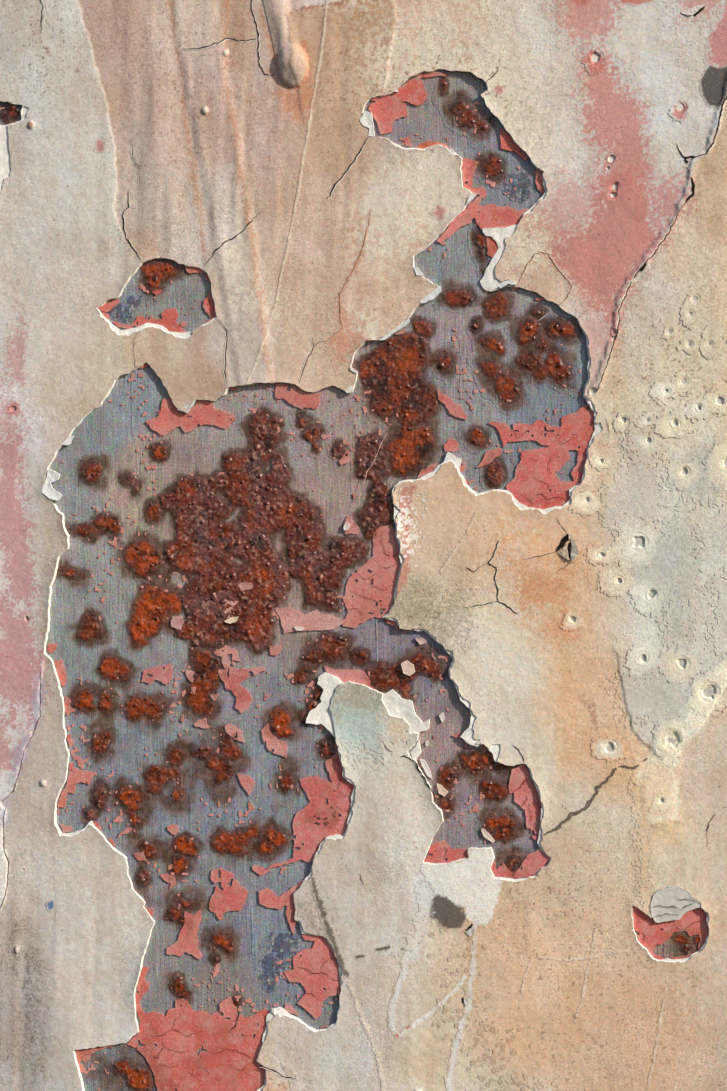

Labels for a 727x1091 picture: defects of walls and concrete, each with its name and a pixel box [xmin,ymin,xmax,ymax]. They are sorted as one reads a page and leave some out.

peeling [0,101,29,192]
crack [122,143,142,261]
crack [206,212,260,264]
peeling [613,369,727,458]
crack [524,437,580,574]
corrosion [54,219,588,972]
peeling [42,69,615,1091]
crack [464,540,518,614]
peeling [556,516,669,618]
peeling [623,642,727,767]
crack [513,745,648,836]
peeling [632,885,709,962]